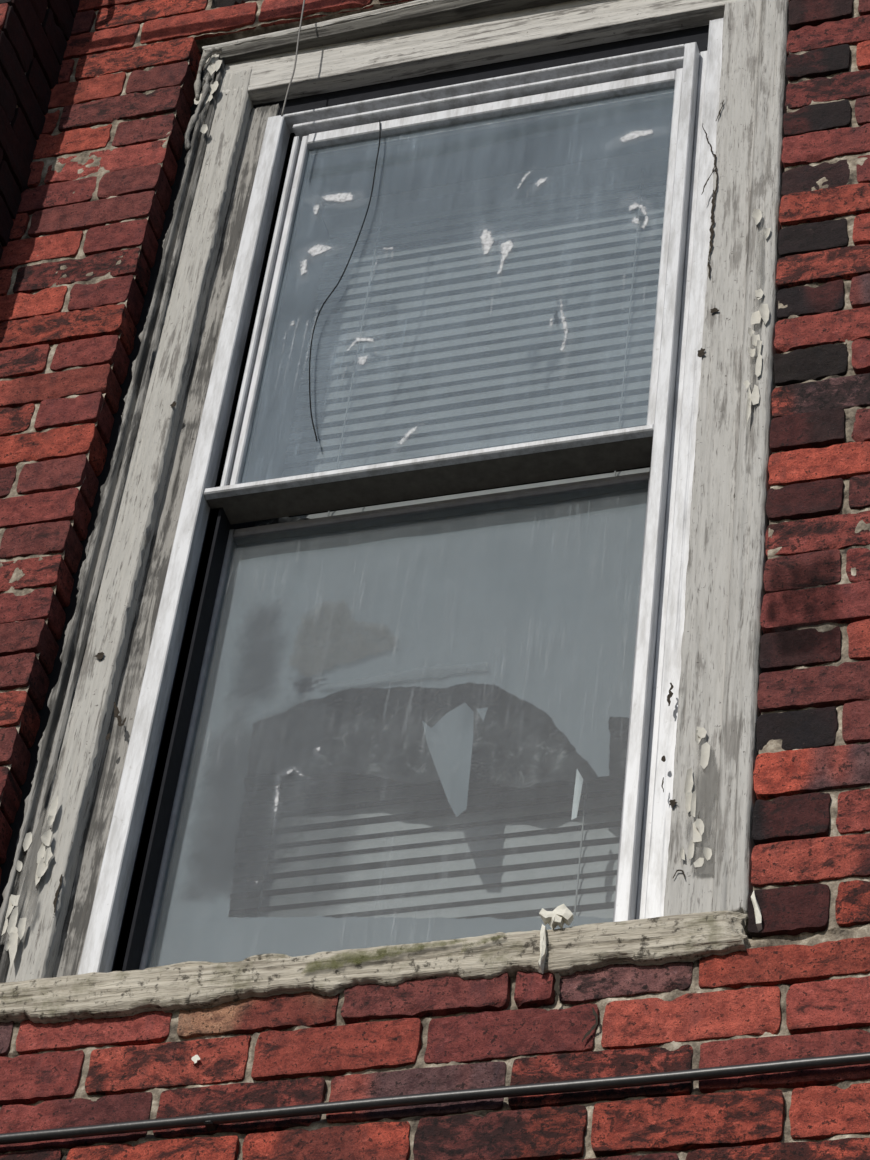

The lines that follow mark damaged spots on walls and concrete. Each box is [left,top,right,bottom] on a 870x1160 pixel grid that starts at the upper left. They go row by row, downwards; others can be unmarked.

peeling [0,796,58,967]
peeling [680,727,720,875]